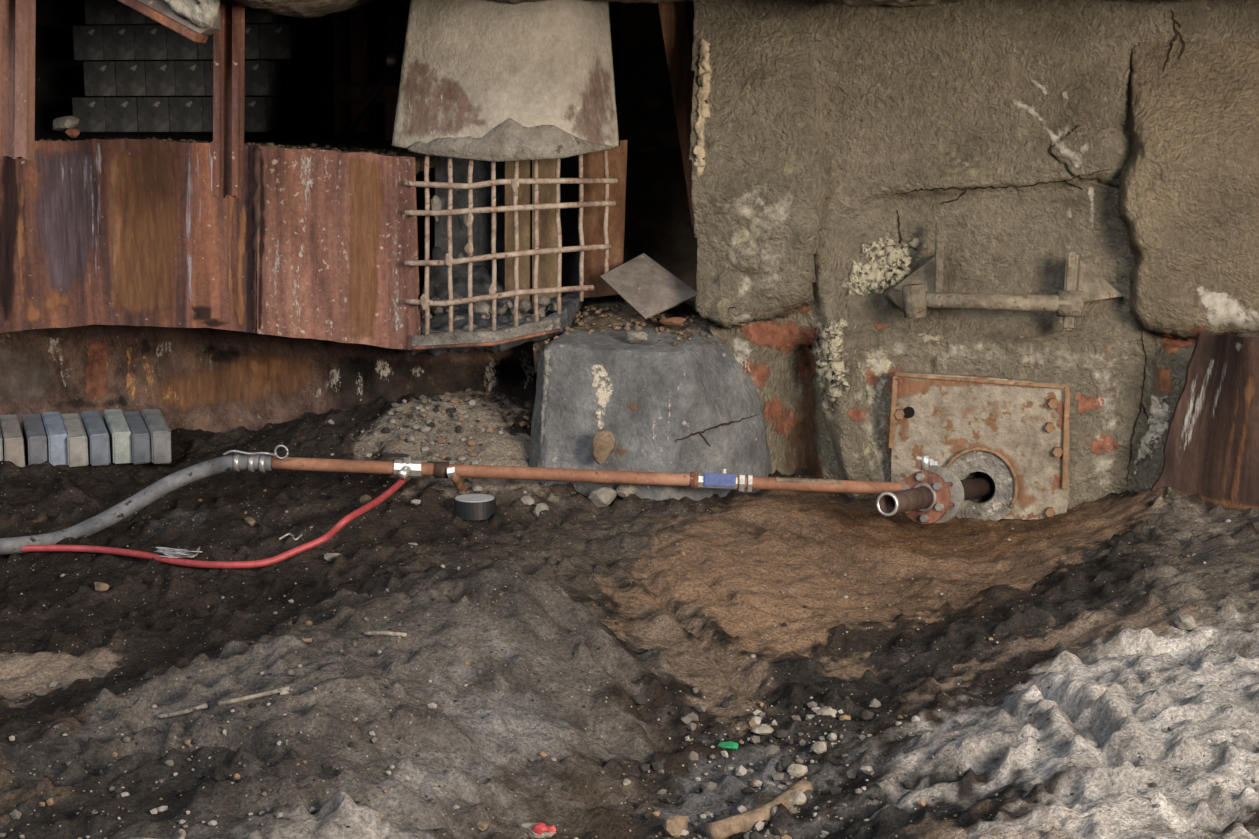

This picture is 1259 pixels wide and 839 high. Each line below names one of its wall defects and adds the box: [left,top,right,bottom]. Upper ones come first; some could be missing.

corrosion [17,186,67,321]
corrosion [111,155,122,302]
corrosion [228,195,246,325]
corrosion [349,159,383,336]
crack [886,169,1109,281]
water stain [733,314,758,392]
corrosion [736,305,822,479]
corrosion [864,367,977,454]
corrosion [1160,326,1205,354]
corrosion [1183,378,1259,510]